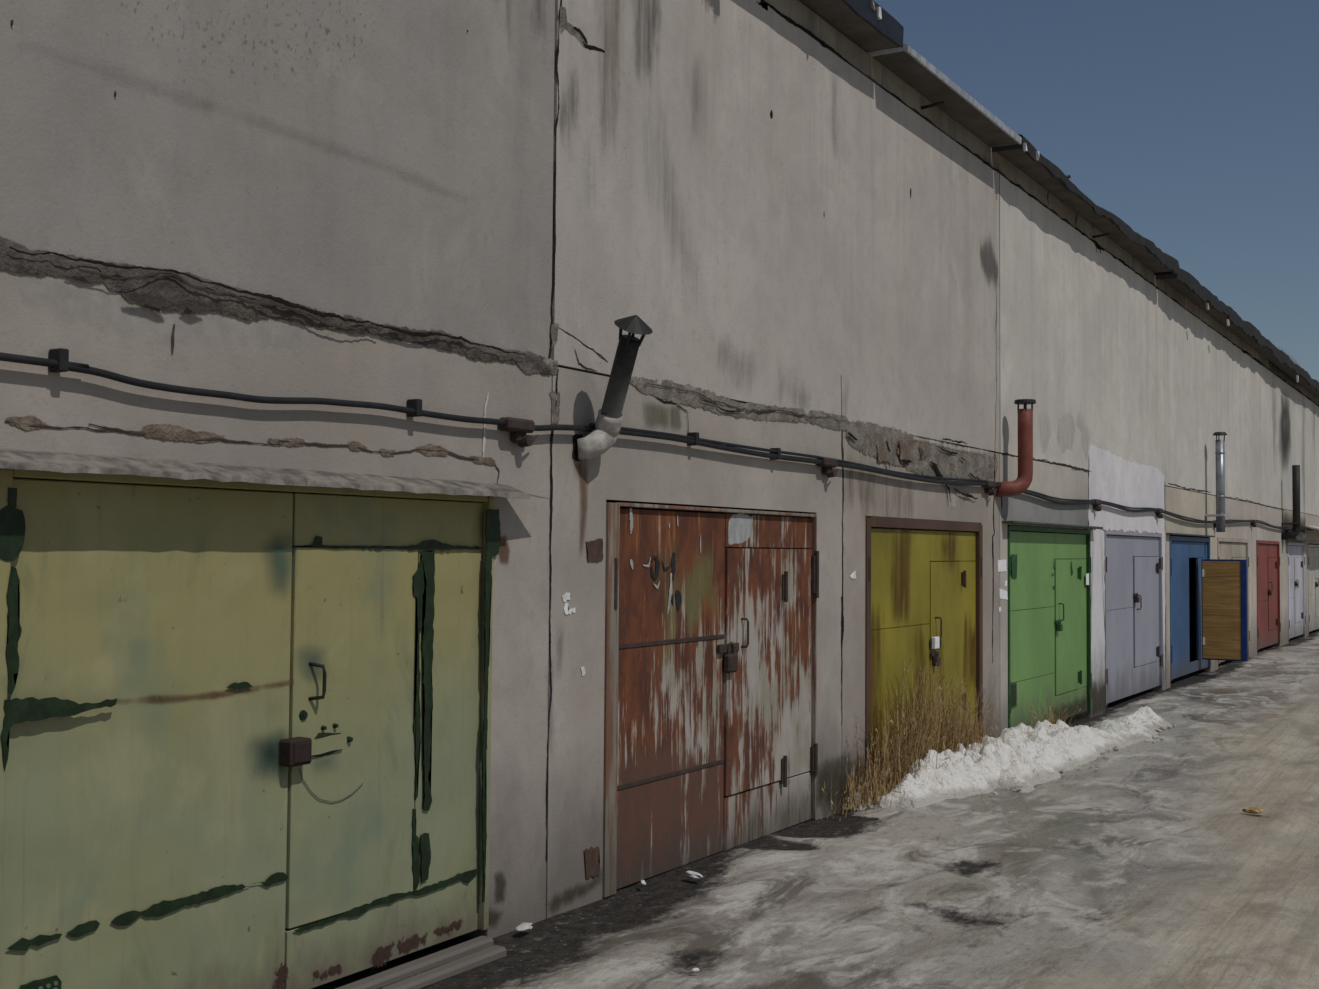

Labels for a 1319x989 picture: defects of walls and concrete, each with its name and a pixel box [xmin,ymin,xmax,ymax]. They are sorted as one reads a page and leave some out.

flaking render [0,236,551,375]
damp [981,245,998,279]
crack [756,0,1319,406]
flaking render [5,392,500,483]
crack [543,0,608,861]
flaking render [630,375,997,506]